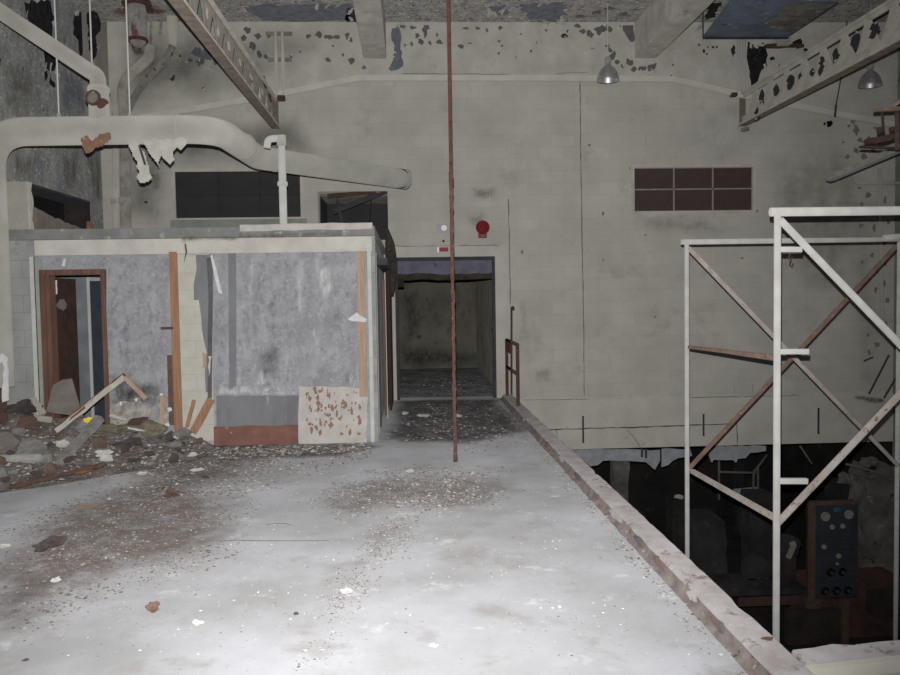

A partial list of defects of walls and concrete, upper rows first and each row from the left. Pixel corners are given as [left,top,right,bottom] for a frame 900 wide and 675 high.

peeling [24,0,57,36]
peeling [44,50,60,88]
peeling [73,9,106,60]
peeling [389,25,443,71]
peeling [462,2,635,55]
peeling [746,39,840,122]
peeling [850,21,881,50]
spalling [571,441,892,534]
spalling [652,555,667,573]
spalling [709,615,725,634]